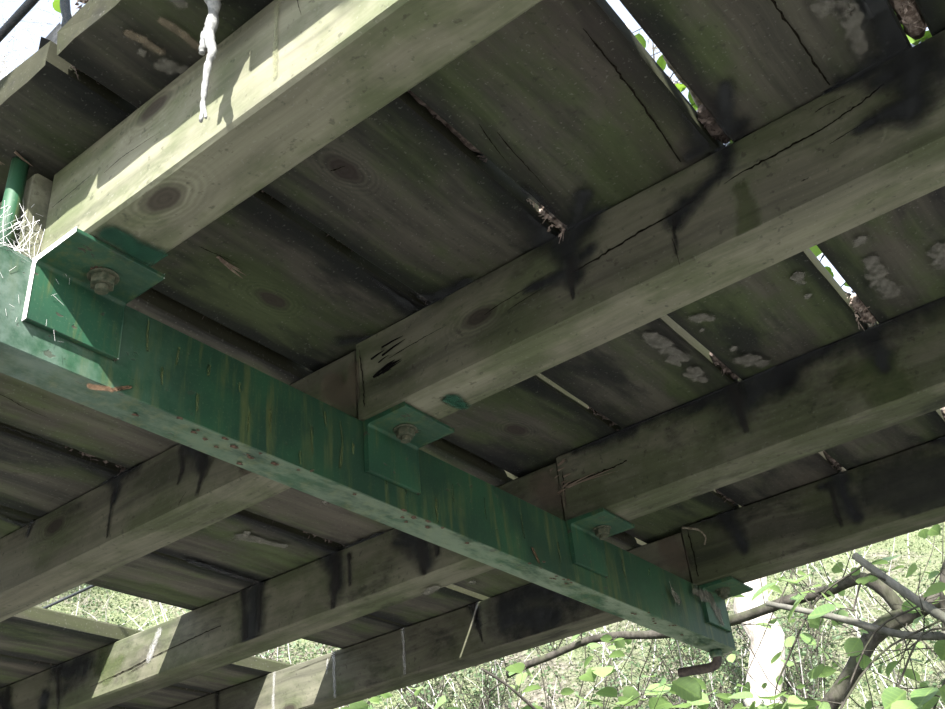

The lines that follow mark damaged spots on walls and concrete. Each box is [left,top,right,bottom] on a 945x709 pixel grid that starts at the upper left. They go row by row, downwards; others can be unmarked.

crack [583,29,681,162]
crack [724,0,878,184]
water stain [823,0,945,134]
water stain [665,81,749,254]
water stain [571,296,945,454]
water stain [177,445,209,495]
water stain [295,532,384,609]
water stain [392,529,439,575]